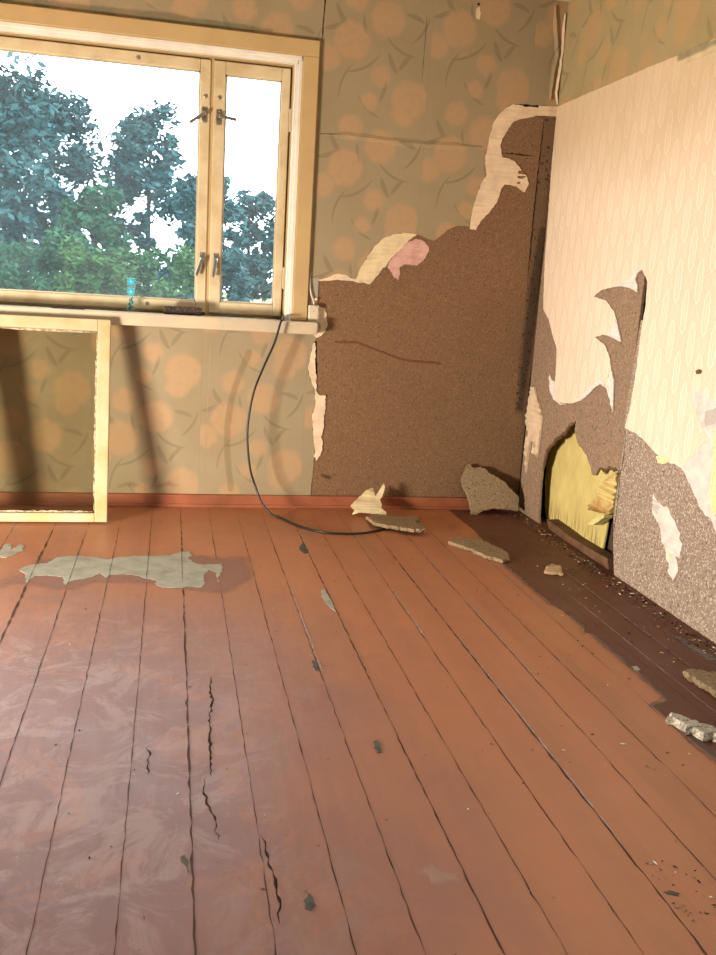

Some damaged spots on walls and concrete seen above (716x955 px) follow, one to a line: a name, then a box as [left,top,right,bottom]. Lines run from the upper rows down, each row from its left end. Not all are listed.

spalling [541,421,620,570]
peeling [4,549,247,592]
crack [203,676,220,840]
crack [261,836,282,923]